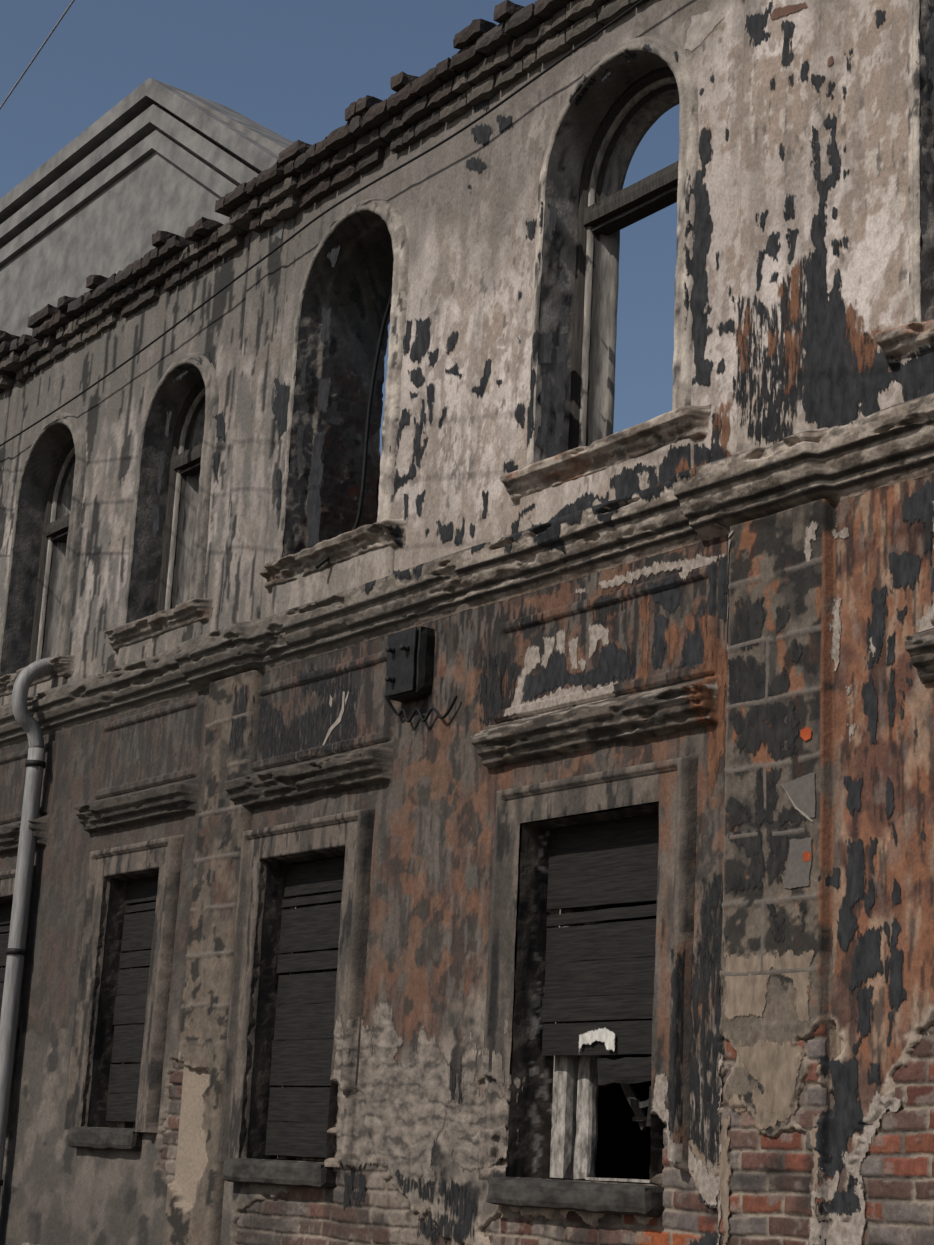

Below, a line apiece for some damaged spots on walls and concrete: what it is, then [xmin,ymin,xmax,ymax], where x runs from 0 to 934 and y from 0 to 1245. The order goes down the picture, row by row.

peeling [683,122,735,387]
peeling [745,0,934,429]
corrosion [737,307,751,373]
corrosion [768,261,804,395]
corrosion [845,299,880,373]
peeling [384,305,727,554]
corrosion [713,402,734,457]
peeling [575,553,725,594]
peeling [804,521,849,562]
peeling [504,624,618,720]
peeling [826,597,842,671]
flaking render [482,949,934,1245]